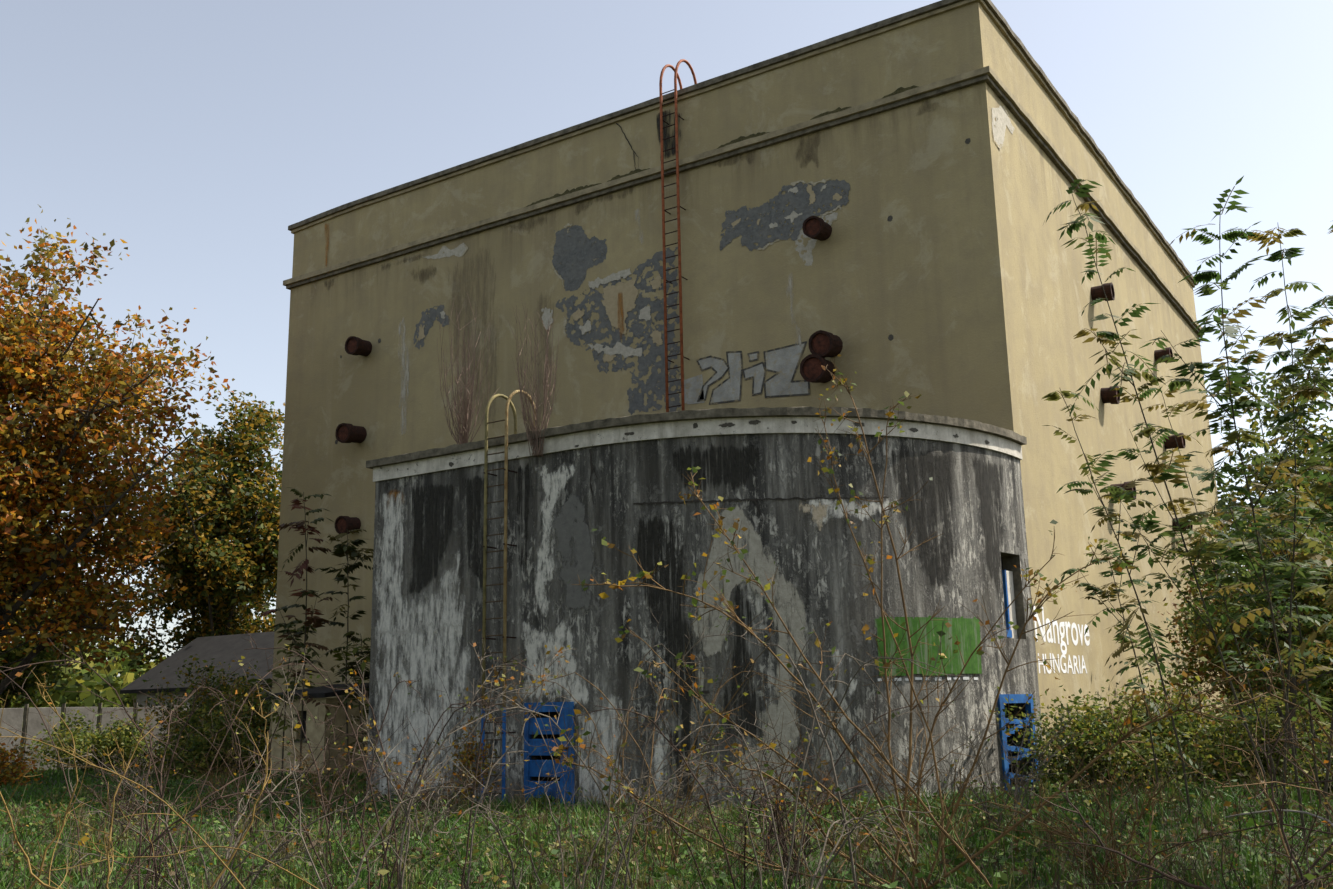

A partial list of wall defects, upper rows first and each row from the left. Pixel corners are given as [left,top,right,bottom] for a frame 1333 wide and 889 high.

flaking render [720,178,850,266]
flaking render [413,305,450,350]
flaking render [541,223,681,415]
damp [409,476,488,593]
damp [516,465,530,570]
damp [673,443,759,492]
damp [892,449,956,586]
damp [973,457,1004,597]
damp [637,516,698,800]
damp [725,586,756,739]